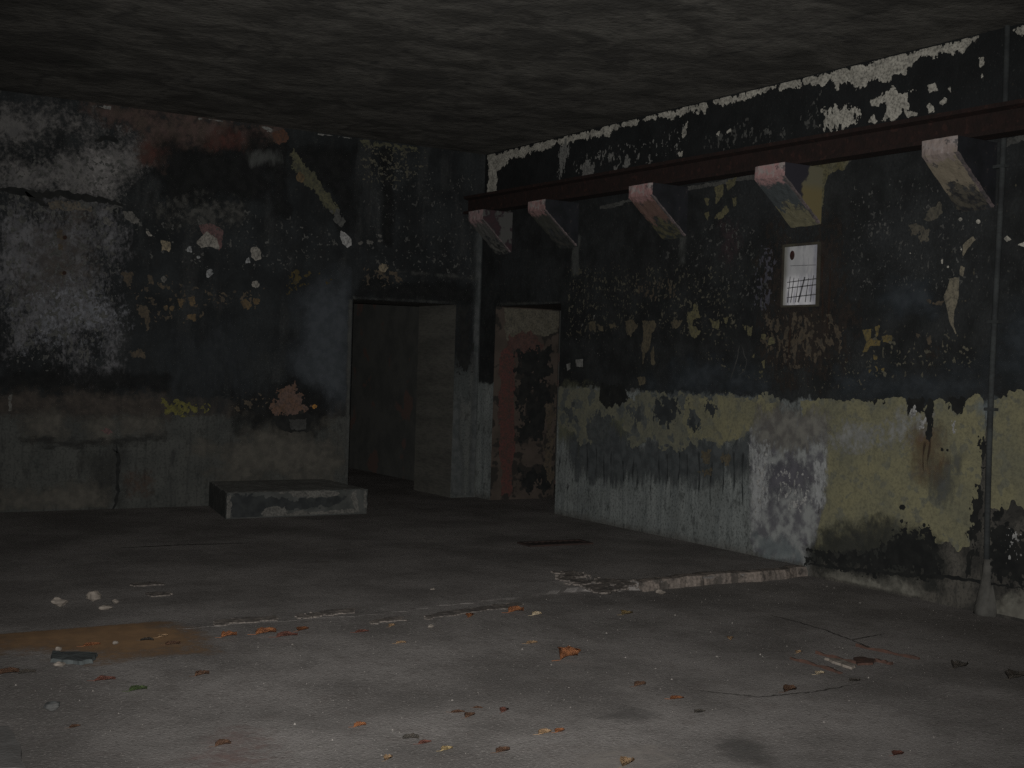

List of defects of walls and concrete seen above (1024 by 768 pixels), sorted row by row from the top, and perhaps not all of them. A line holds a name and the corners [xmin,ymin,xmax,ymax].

crack [0,187,123,206]
water stain [0,100,145,375]
peeling [121,126,476,332]
peeling [487,35,979,192]
peeling [504,174,1024,552]
spalling [636,565,808,592]